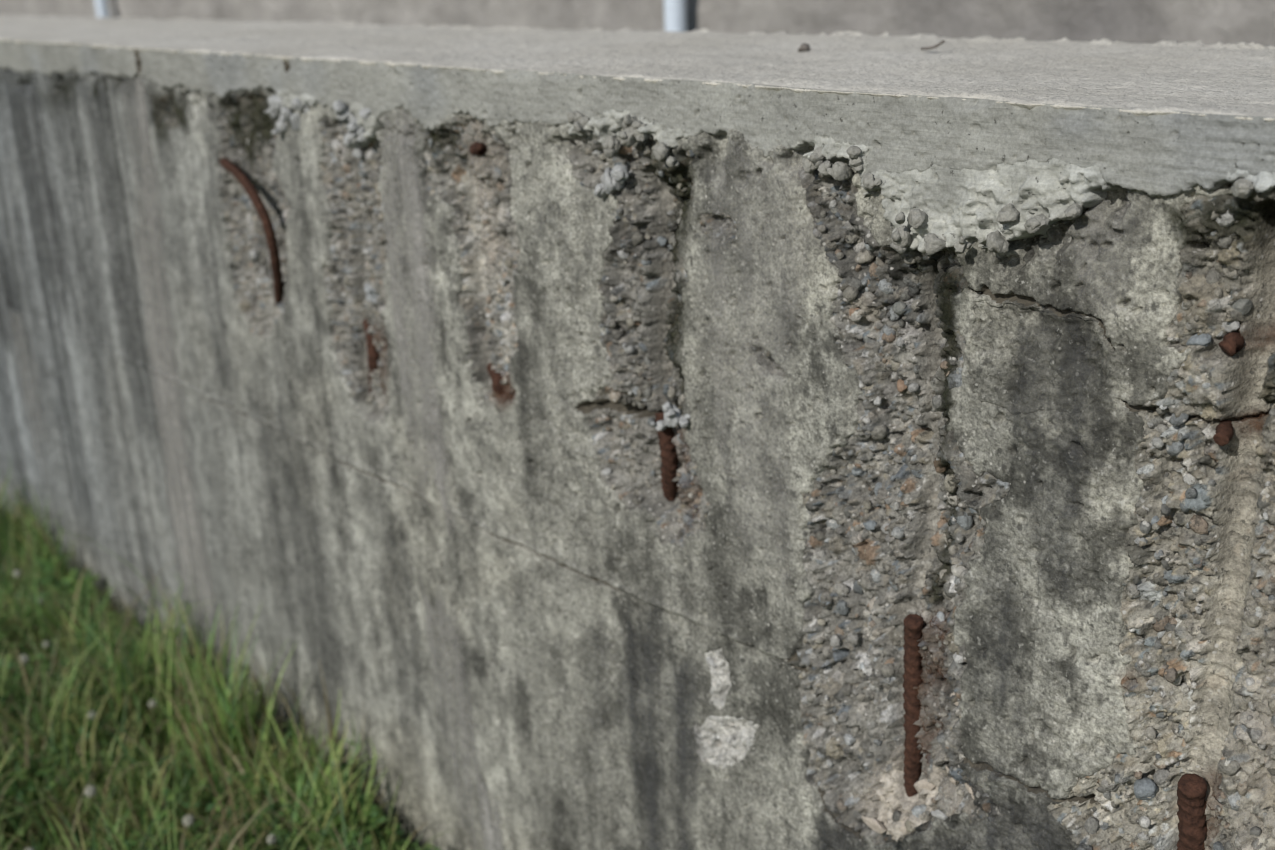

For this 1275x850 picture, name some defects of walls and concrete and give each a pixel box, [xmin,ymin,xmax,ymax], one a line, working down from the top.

spalling [218,92,291,339]
spalling [319,116,389,423]
spalling [423,117,520,404]
crack [477,526,620,591]
crack [577,398,663,419]
spalling [567,137,711,548]
crack [787,651,808,673]
spalling [797,163,1107,845]
crack [971,285,1115,350]
crack [1123,400,1156,412]
spalling [1047,193,1275,850]
crack [1188,399,1275,425]